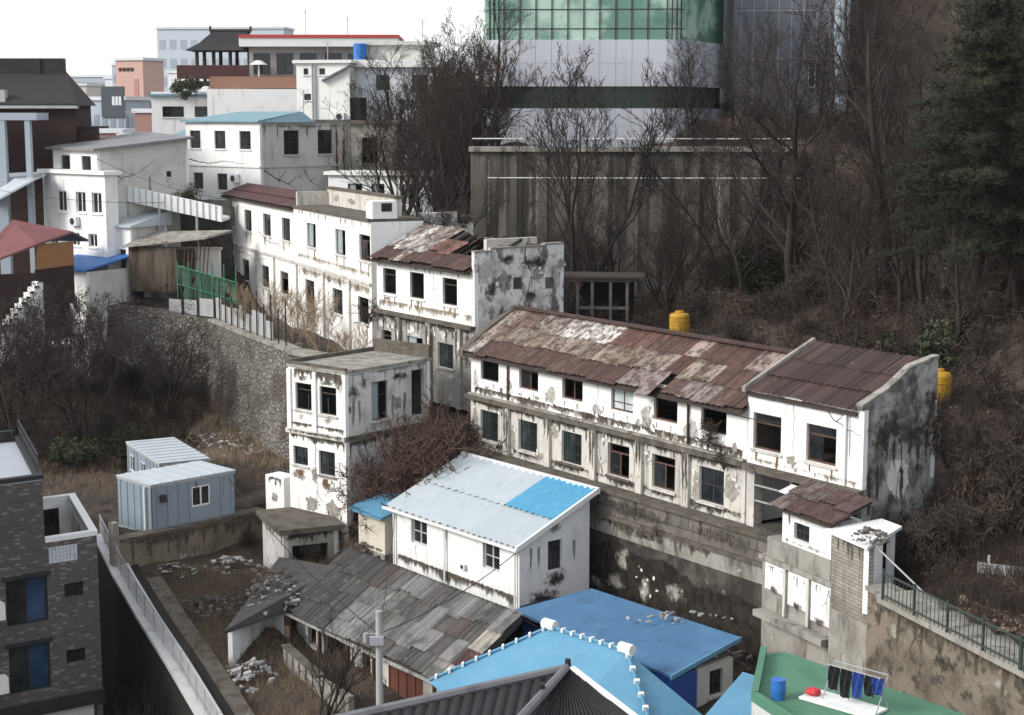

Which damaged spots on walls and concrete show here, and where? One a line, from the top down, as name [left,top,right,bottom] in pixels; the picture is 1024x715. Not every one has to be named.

peeling [294,368,342,394]
leakage [378,363,425,379]
leakage [290,374,395,454]
spalling [472,370,743,458]
leakage [814,390,939,515]
peeling [291,466,359,542]
peeling [690,469,699,508]
leakage [398,554,514,607]
spalling [639,580,650,600]
spalling [666,585,683,601]